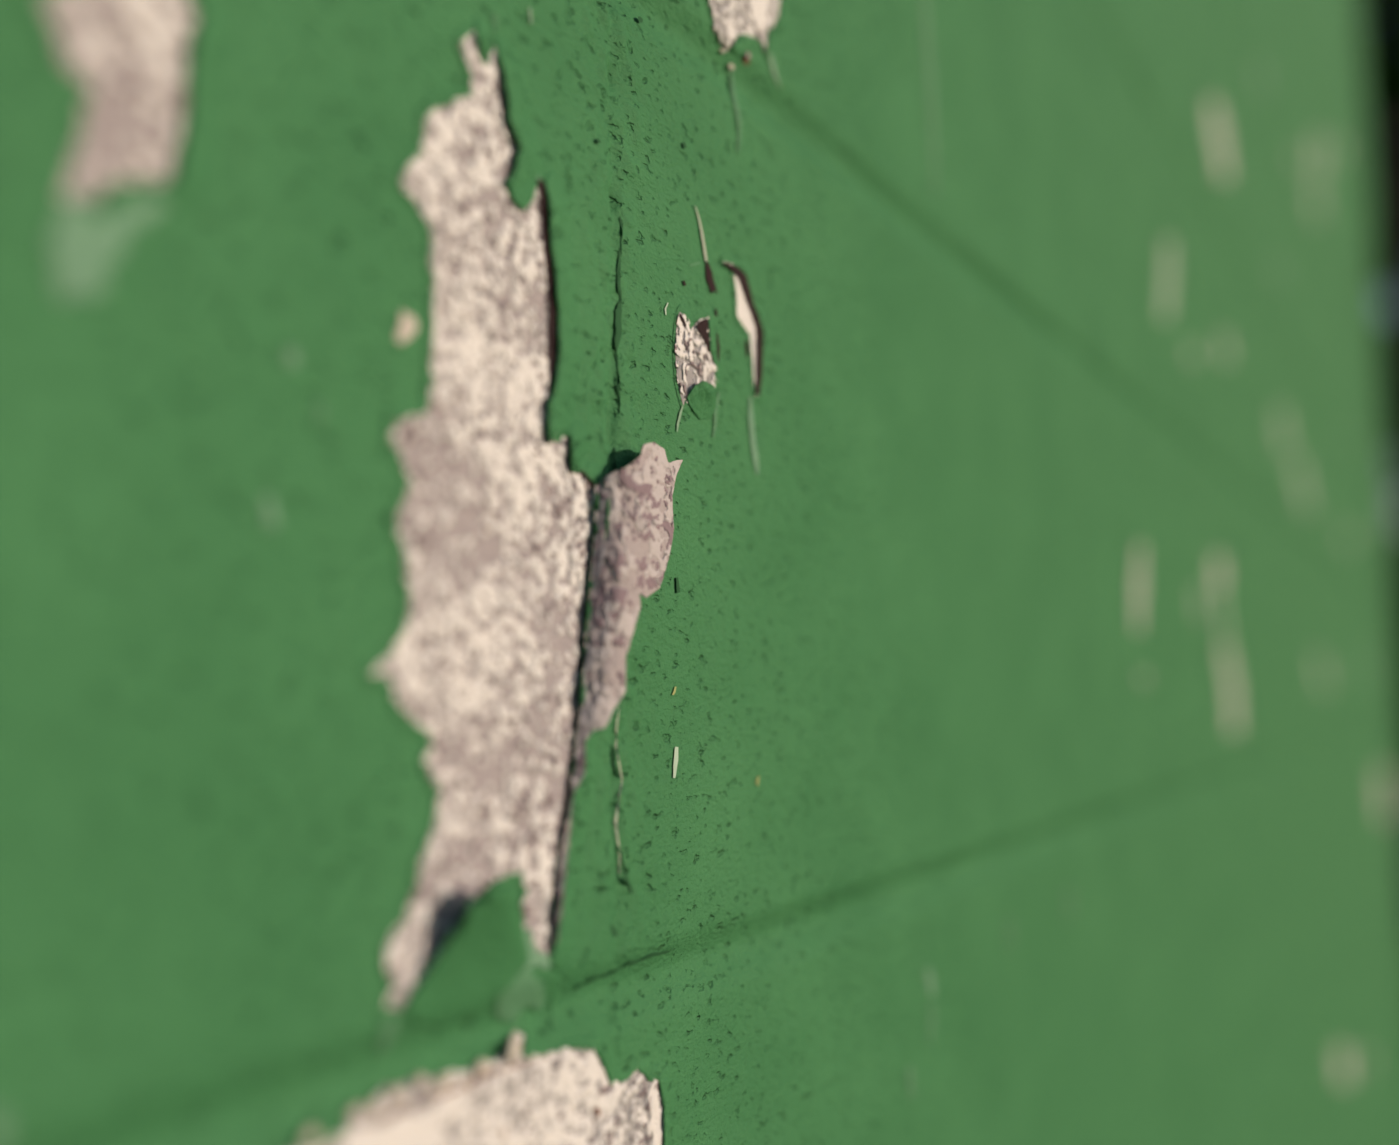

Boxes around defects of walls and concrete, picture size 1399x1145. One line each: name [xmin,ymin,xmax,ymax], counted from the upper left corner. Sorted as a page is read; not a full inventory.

peeling [705,0,789,63]
peeling [26,0,228,219]
peeling [672,304,723,414]
peeling [720,254,770,406]
peeling [360,16,683,1027]
peeling [291,1012,676,1145]